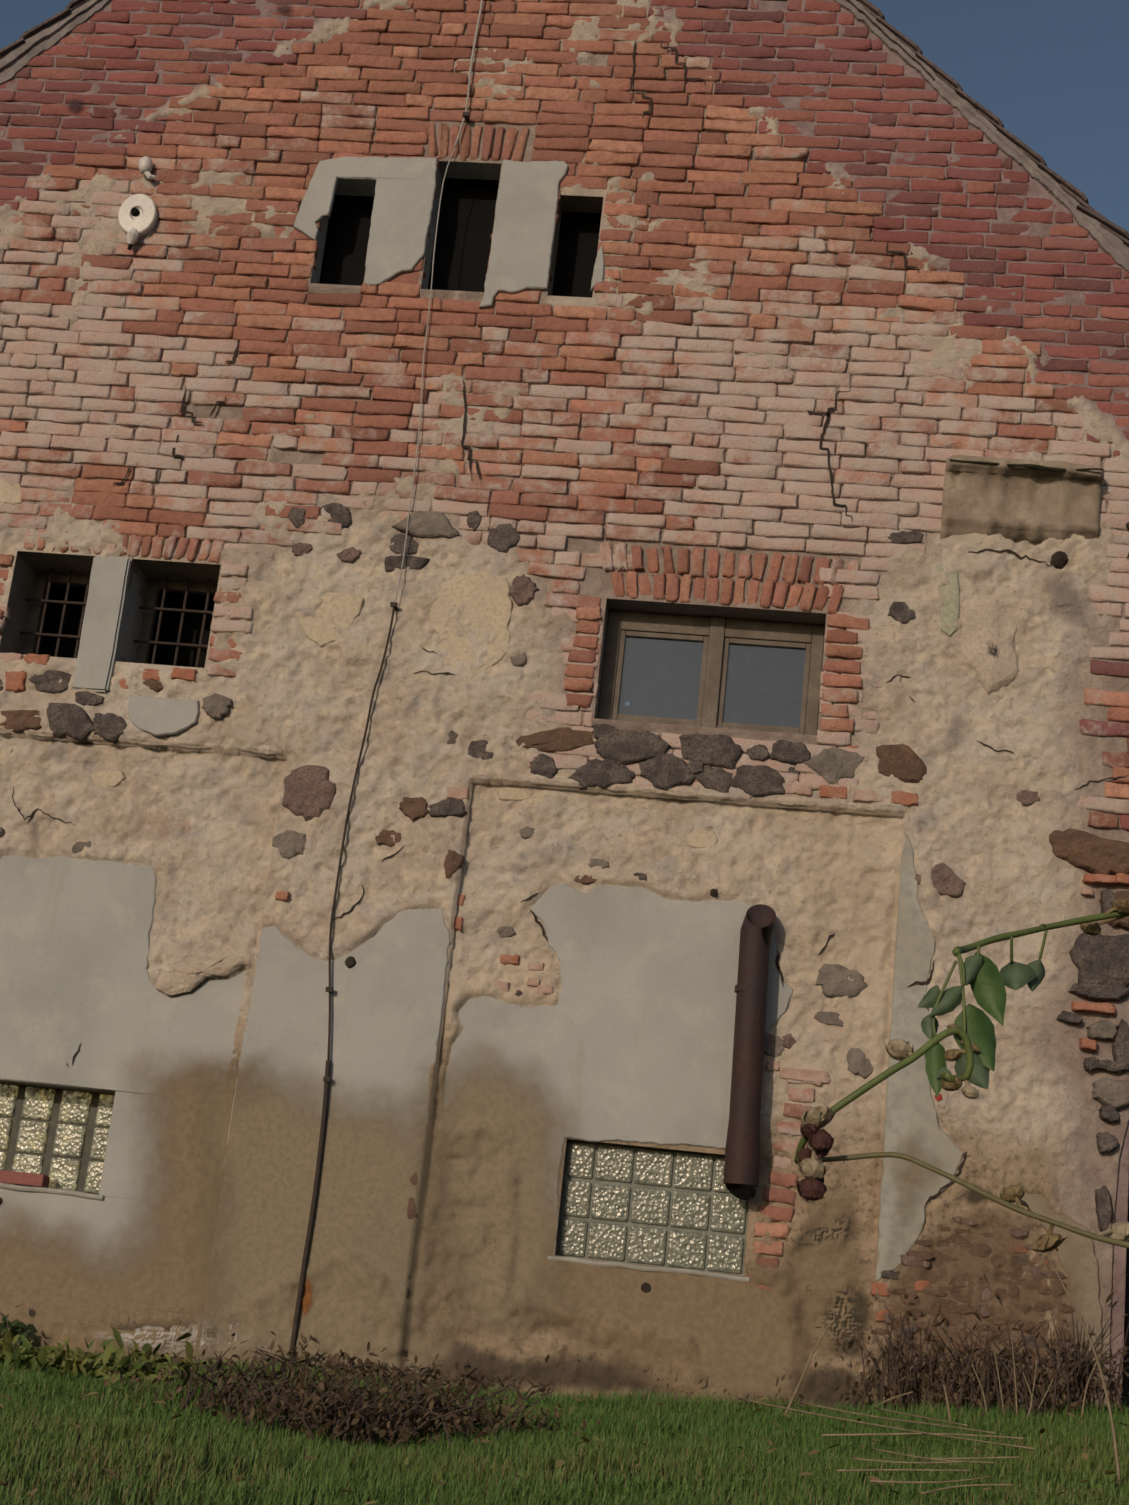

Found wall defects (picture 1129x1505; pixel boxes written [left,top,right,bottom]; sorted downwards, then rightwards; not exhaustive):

crack [630,40,706,118]
flaking render [294,157,438,288]
flaking render [479,160,569,309]
crack [886,241,919,273]
crack [807,385,853,520]
spalling [887,601,916,624]
spalling [272,765,337,859]
spalling [375,787,469,847]
flaking render [0,841,751,1267]
spalling [813,964,868,1027]
flaking render [847,832,1112,1409]
leakage [0,1066,873,1408]